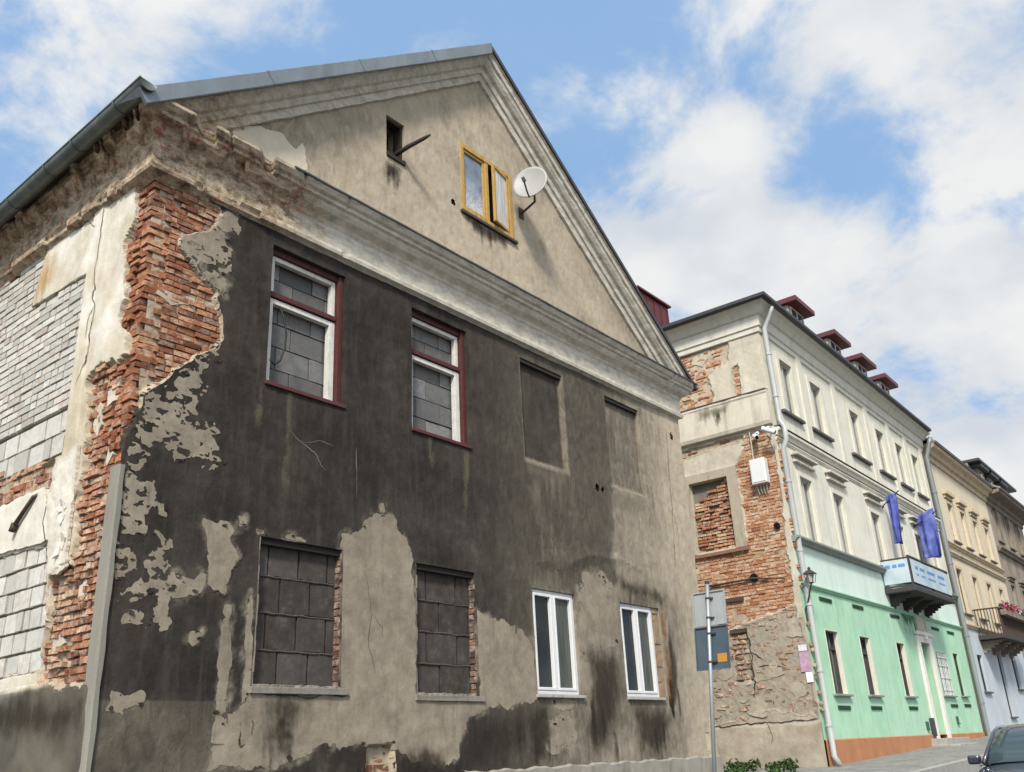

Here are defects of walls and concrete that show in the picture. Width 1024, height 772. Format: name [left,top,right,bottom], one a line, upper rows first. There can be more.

peeling [232,125,308,172]
crack [76,209,104,381]
spalling [679,342,741,412]
peeling [0,180,538,772]
crack [294,435,357,470]
spalling [682,430,803,631]
damp [0,700,80,729]